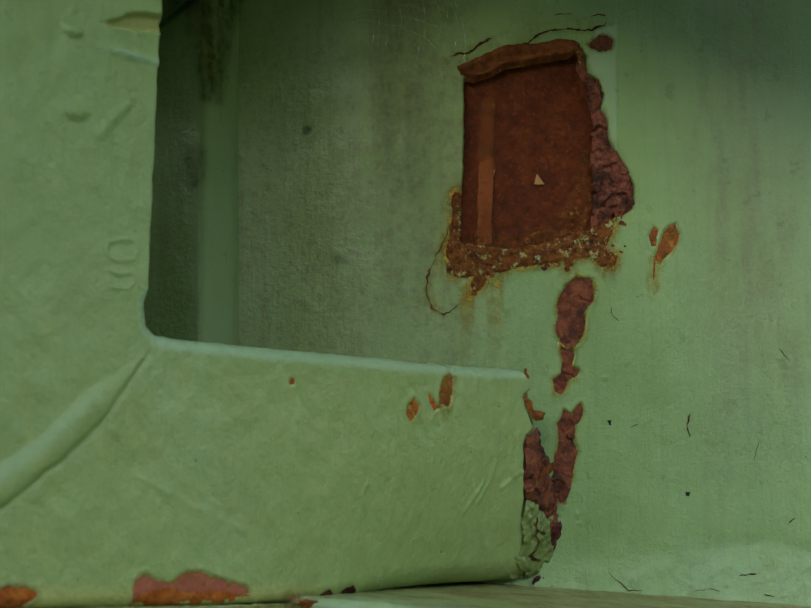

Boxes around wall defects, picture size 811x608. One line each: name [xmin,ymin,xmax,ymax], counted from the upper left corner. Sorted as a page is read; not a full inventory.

crack [451,38,492,61]
crack [523,13,607,74]
corrosion [588,34,613,52]
corrosion [442,38,635,307]
crack [426,227,461,315]
peeling [649,224,679,280]
peeling [553,275,597,395]
peeling [406,398,419,421]
peeling [429,374,453,410]
peeling [551,403,583,504]
peeling [128,572,250,606]